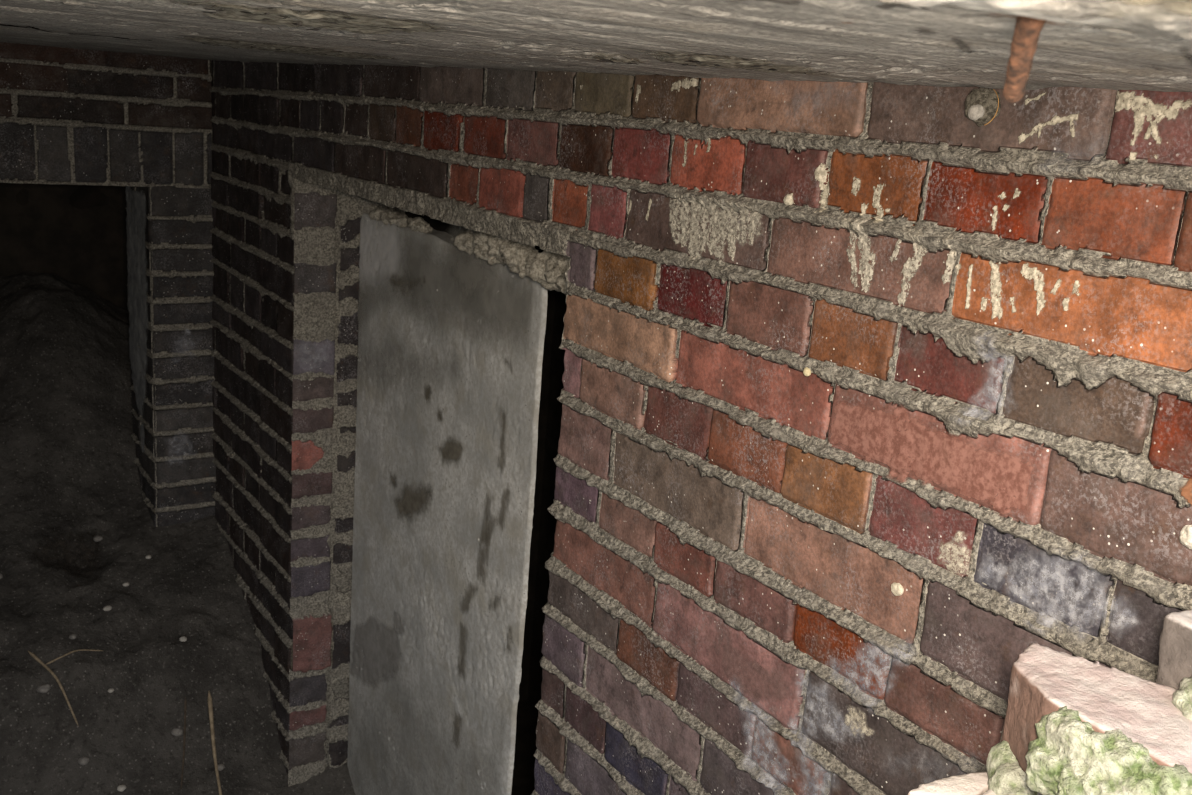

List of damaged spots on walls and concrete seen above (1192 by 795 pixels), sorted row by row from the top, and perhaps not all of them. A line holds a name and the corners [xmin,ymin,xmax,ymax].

efflorescence [1115,91,1192,160]
efflorescence [814,163,829,213]
efflorescence [841,177,890,293]
efflorescence [889,225,927,306]
efflorescence [942,233,1016,319]
efflorescence [1020,263,1080,315]
damp [440,439,462,462]
damp [391,476,432,518]
damp [462,490,509,611]
damp [350,613,403,683]